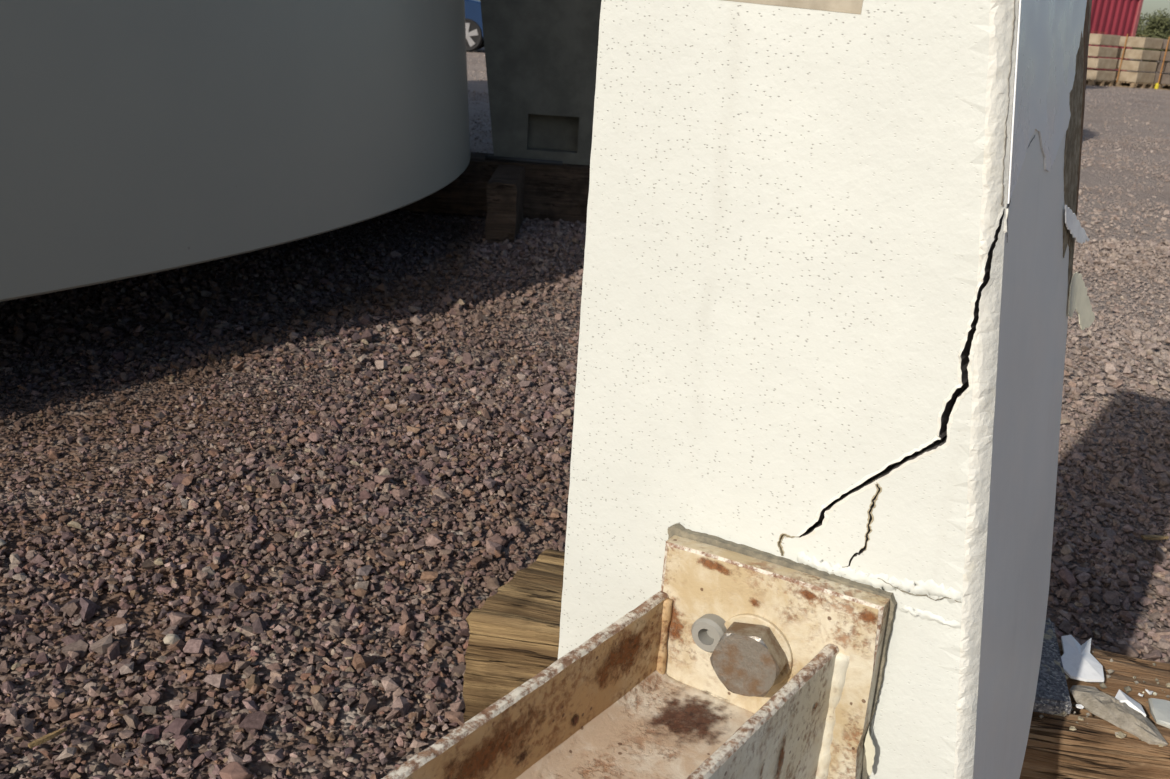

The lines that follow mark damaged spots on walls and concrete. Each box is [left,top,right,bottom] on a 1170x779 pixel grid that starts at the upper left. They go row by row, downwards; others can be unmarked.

peeling [1007,0,1095,330]
crack [777,0,1035,568]
rust [668,599,684,641]
rust [698,558,729,575]
rust [859,611,876,622]
crack [877,578,959,602]
rust [596,626,649,688]
rust [650,691,725,744]
rust [446,711,545,779]
rust [776,739,786,779]